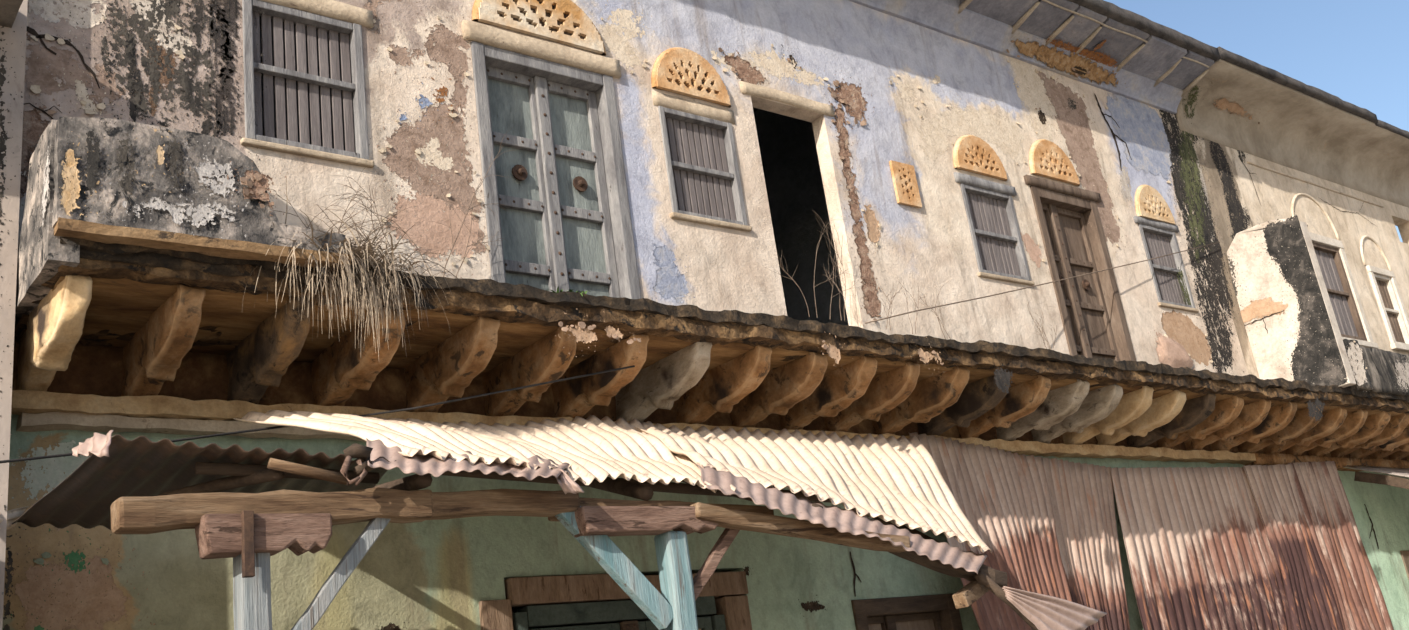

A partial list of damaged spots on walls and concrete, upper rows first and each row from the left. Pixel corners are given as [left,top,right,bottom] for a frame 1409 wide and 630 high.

water stain [0,26,23,300]
crack [27,26,100,88]
water stain [37,0,267,233]
flaking render [363,0,490,278]
flaking render [710,40,886,330]
flaking render [885,37,1179,249]
water stain [1158,109,1348,429]
water stain [2,527,27,630]